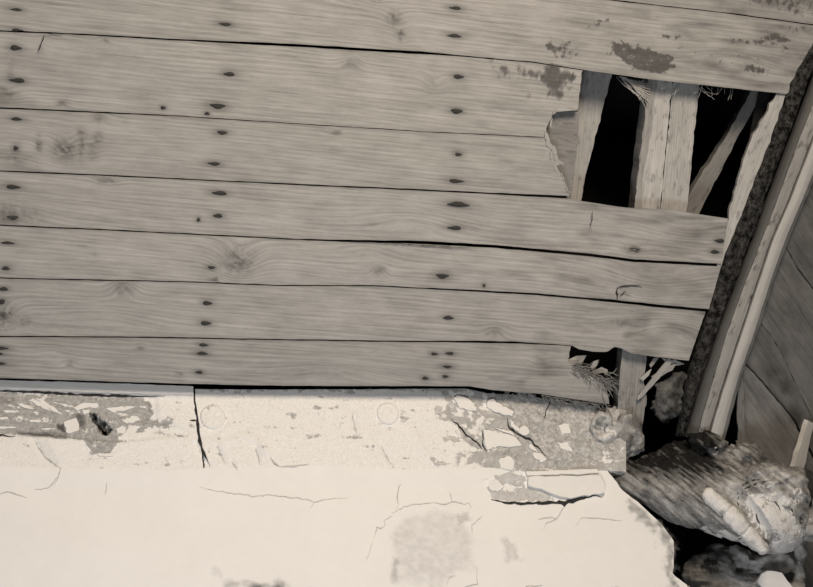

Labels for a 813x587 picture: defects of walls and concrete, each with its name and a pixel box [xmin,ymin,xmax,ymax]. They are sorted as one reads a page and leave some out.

peeling [443,392,619,502]
crack [366,484,481,560]
crack [491,495,619,528]